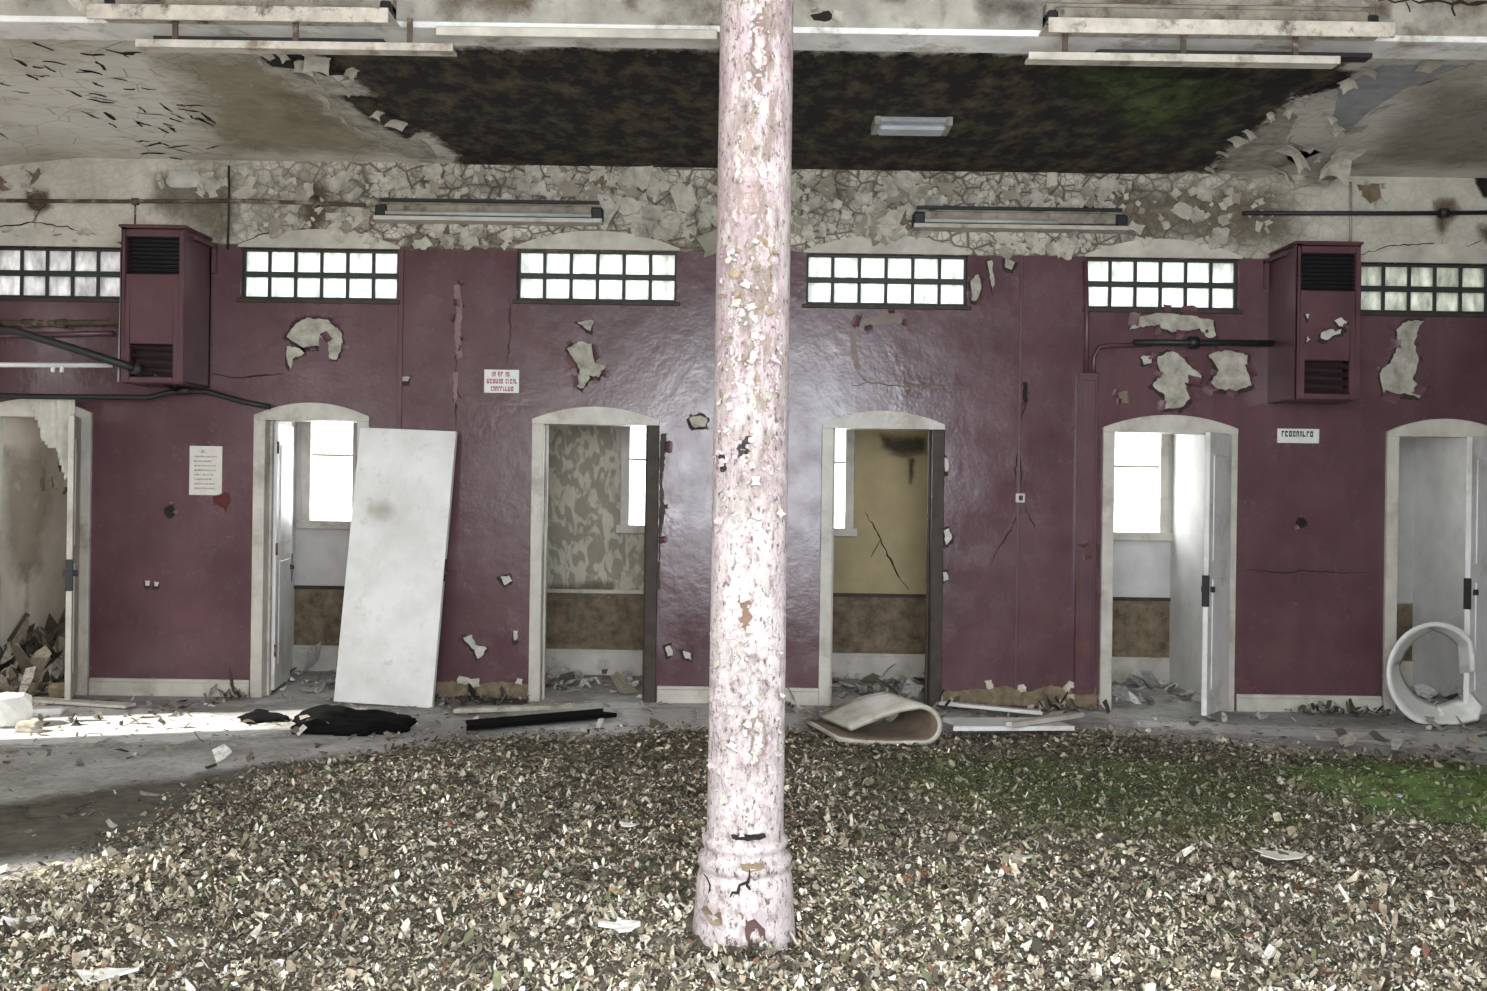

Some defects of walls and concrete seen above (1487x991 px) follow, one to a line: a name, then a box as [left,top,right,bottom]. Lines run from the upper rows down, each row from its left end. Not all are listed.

spalling [67,0,104,16]
water stain [179,46,720,168]
peeling [745,7,774,102]
spalling [810,7,844,22]
water stain [792,51,1356,174]
peeling [973,59,1474,250]
peeling [1127,304,1257,415]
peeling [1303,313,1350,346]
peeling [1375,317,1427,404]
peeling [232,54,957,809]